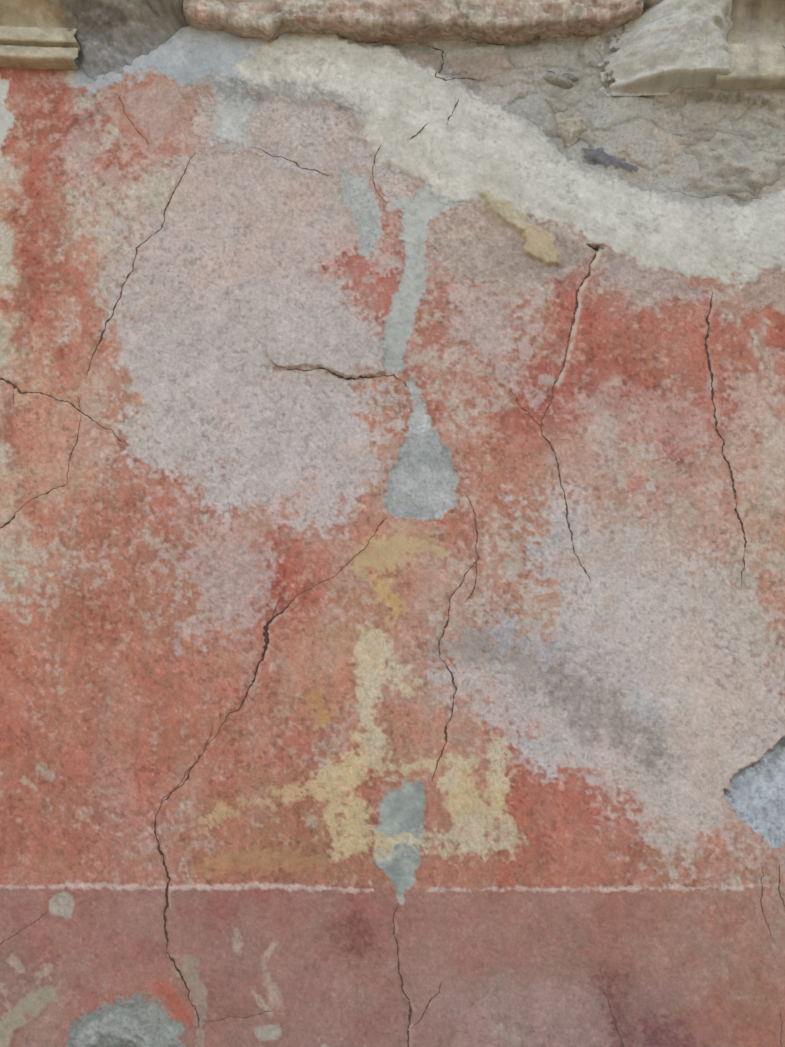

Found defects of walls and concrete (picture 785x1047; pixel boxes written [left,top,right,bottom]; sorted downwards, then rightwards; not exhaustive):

flaking render [362,30,785,206]
crack [0,153,196,528]
crack [154,520,384,1029]
crack [274,363,409,388]
crack [432,494,479,781]
crack [510,253,596,581]
peeling [421,186,785,880]
crack [704,291,747,582]
crack [393,906,442,1047]